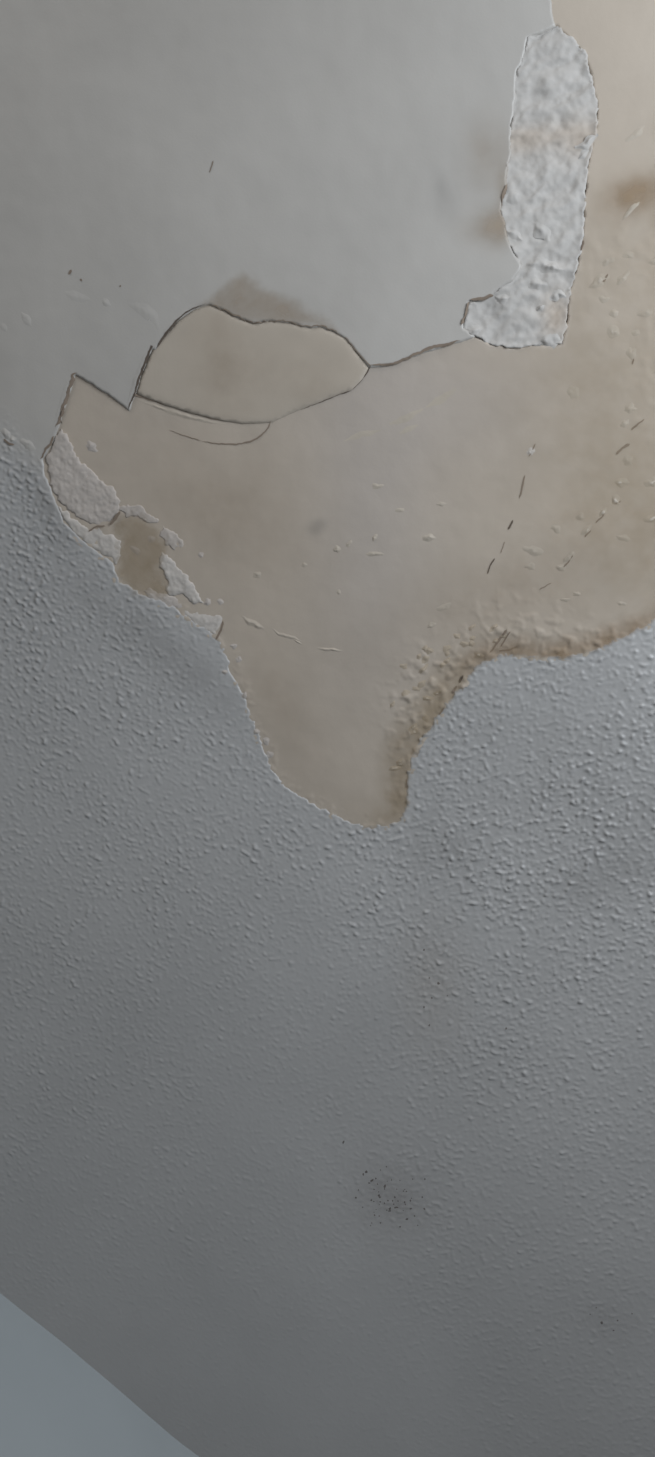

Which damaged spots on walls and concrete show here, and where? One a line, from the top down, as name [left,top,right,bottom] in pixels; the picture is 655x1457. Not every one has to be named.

crack [40,370,75,459]
crack [127,304,460,445]
peeling [0,0,655,830]